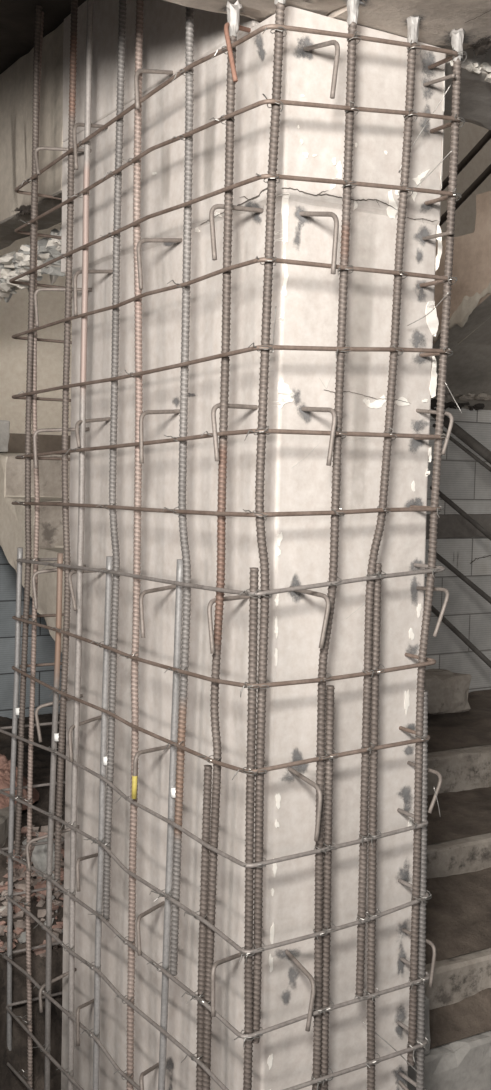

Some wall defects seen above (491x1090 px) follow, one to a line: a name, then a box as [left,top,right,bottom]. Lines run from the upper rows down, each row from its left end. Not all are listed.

spalling [0,0,94,1090]
crack [199,187,436,226]
spalling [355,16,491,1090]